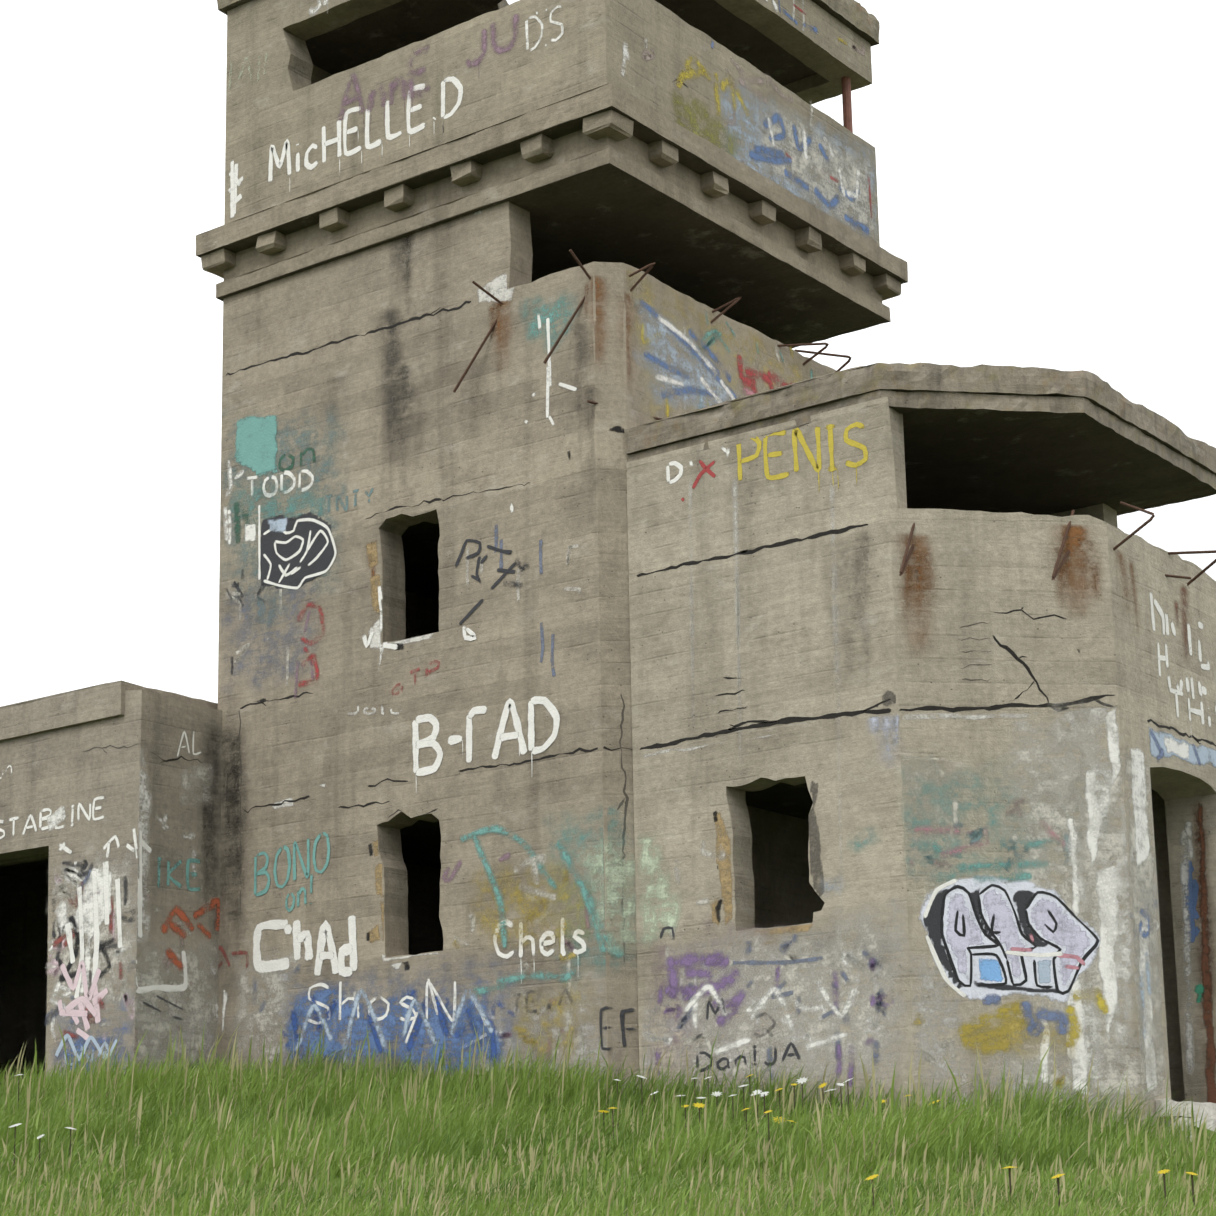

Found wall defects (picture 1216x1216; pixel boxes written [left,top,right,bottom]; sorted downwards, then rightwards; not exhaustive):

crack [226,301,471,375]
crack [637,524,868,577]
corrosion [1058,526,1098,590]
corrosion [1175,587,1187,644]
crack [1147,719,1216,746]
crack [459,607,1114,962]